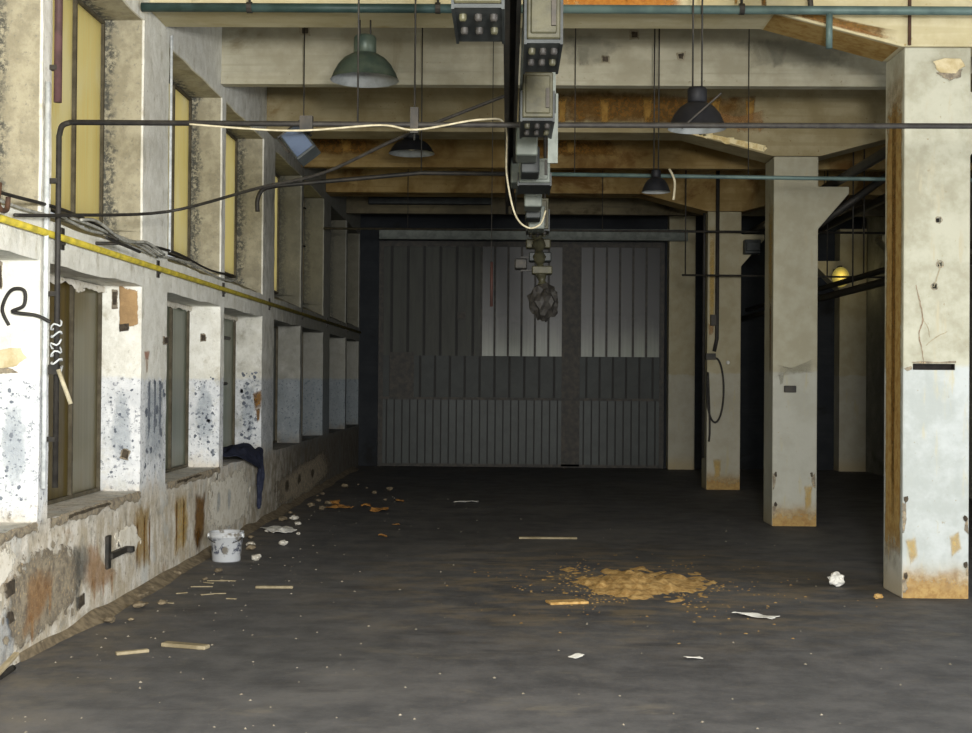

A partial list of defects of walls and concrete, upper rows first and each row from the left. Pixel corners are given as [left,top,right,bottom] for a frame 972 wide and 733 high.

spalling [933,58,965,80]
crack [916,259,946,364]
rust [772,510,816,526]
peeling [114,524,142,551]
flaking render [0,541,85,651]
rust [903,574,968,599]